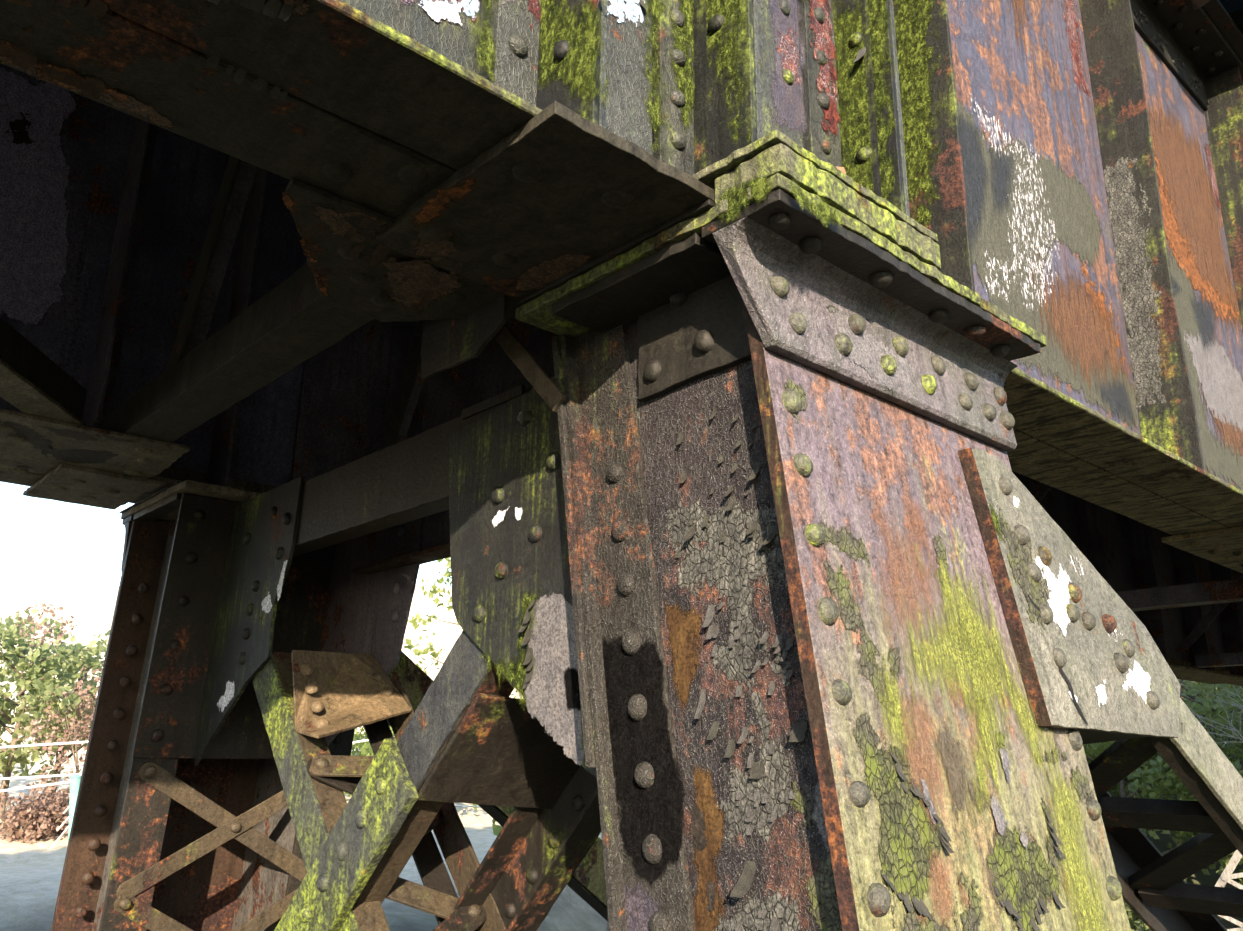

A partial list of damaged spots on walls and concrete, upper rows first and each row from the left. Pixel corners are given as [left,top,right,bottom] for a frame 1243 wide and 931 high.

peeling [419,0,480,25]
peeling [607,0,647,27]
corrosion [1012,0,1026,45]
corrosion [1062,0,1091,96]
peeling [0,67,77,326]
corrosion [1032,256,1134,390]
peeling [483,593,585,766]
corrosion [666,604,701,711]
peeling [667,422,842,931]
peeling [1122,660,1150,704]
leakage [936,726,992,820]
corrosion [691,767,724,931]